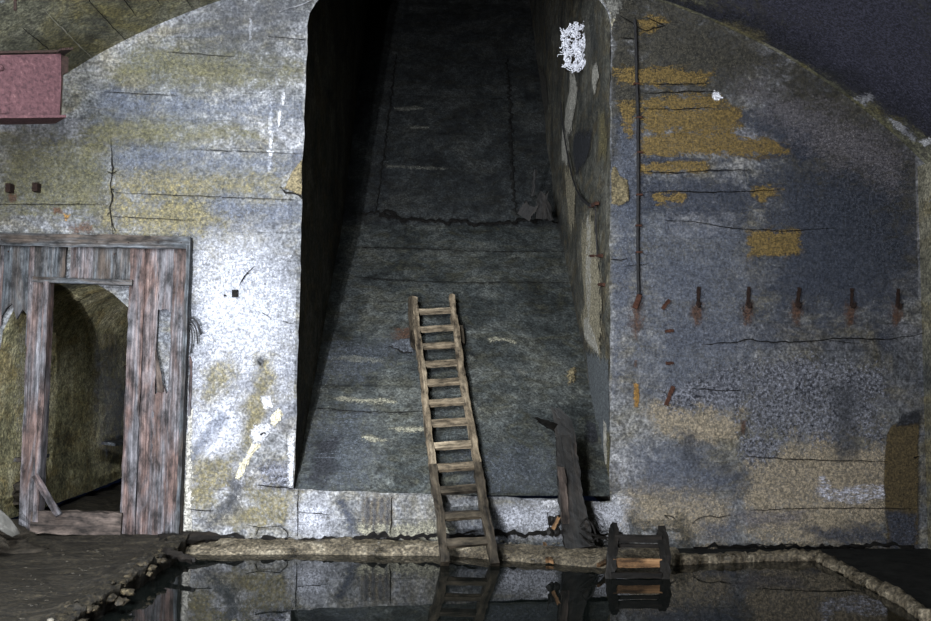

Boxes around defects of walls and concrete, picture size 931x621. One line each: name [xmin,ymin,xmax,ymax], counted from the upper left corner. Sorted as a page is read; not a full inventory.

crack [361,54,558,228]
peeling [612,65,793,178]
crack [0,148,302,232]
spalling [611,166,630,206]
peeling [652,190,689,208]
crack [362,245,565,253]
peeling [741,226,804,262]
crack [701,333,923,345]